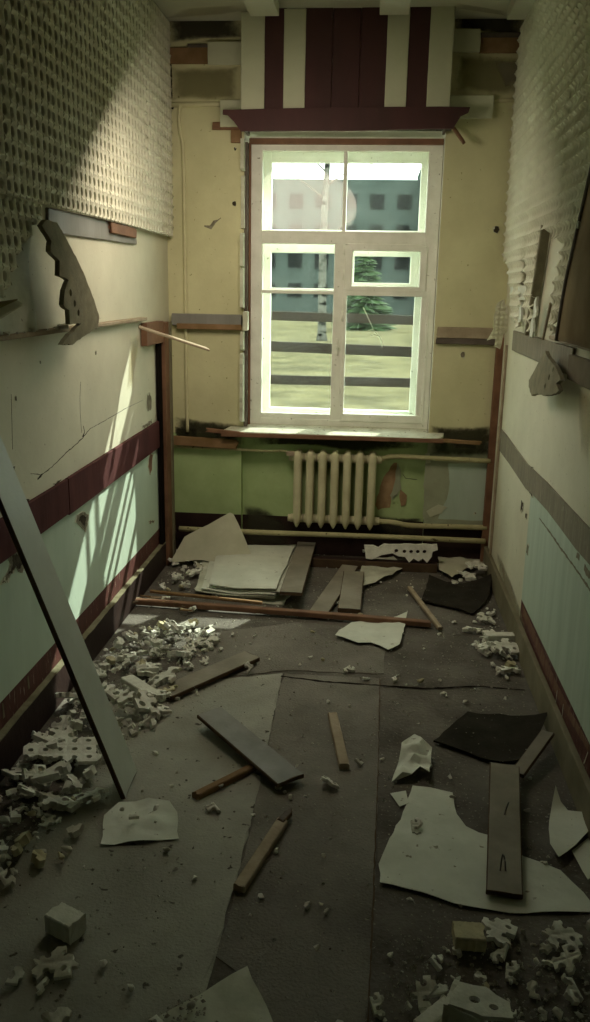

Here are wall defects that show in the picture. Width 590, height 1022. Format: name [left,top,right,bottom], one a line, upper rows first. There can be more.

crack [37,406,130,479]
peeling [375,463,407,519]